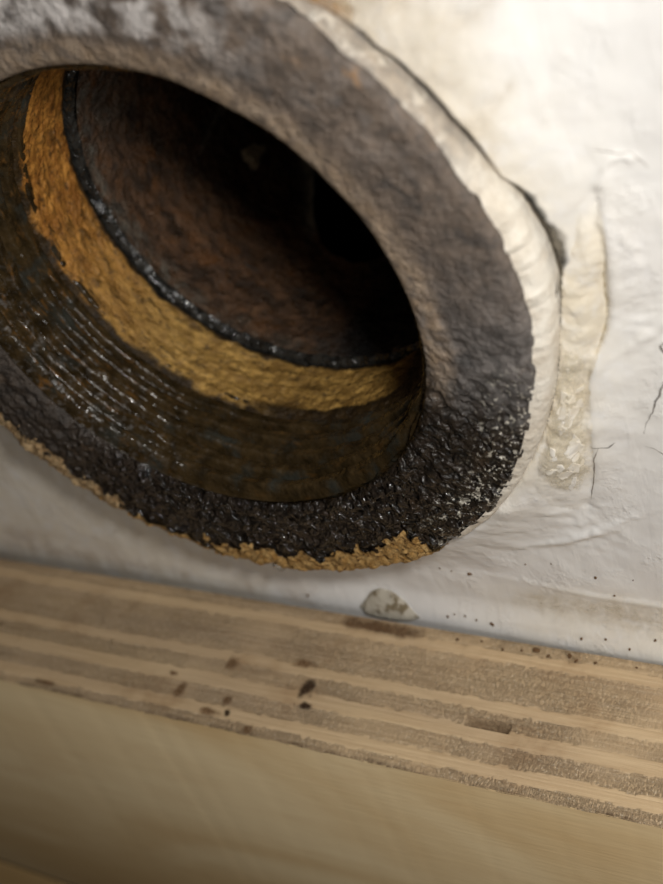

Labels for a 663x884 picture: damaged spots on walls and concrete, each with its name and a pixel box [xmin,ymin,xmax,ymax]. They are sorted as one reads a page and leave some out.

corrosion [0,412,449,572]
crack [644,386,663,453]